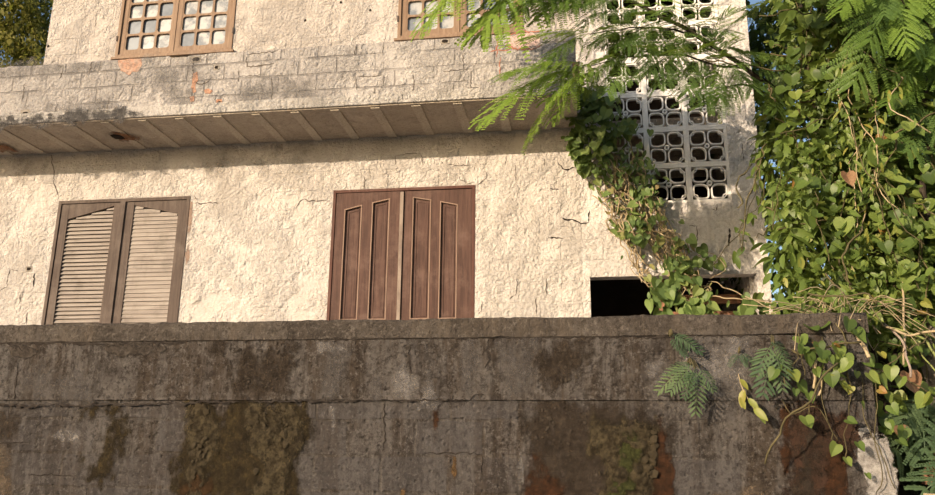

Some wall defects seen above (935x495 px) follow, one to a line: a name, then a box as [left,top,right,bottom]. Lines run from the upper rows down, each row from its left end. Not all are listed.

leakage [0,100,144,132]
spalling [118,58,142,75]
spalling [189,56,222,103]
crack [548,210,590,239]
leakage [182,400,220,495]
leakage [242,400,305,495]
corrosion [652,418,675,495]
corrosion [772,400,860,495]